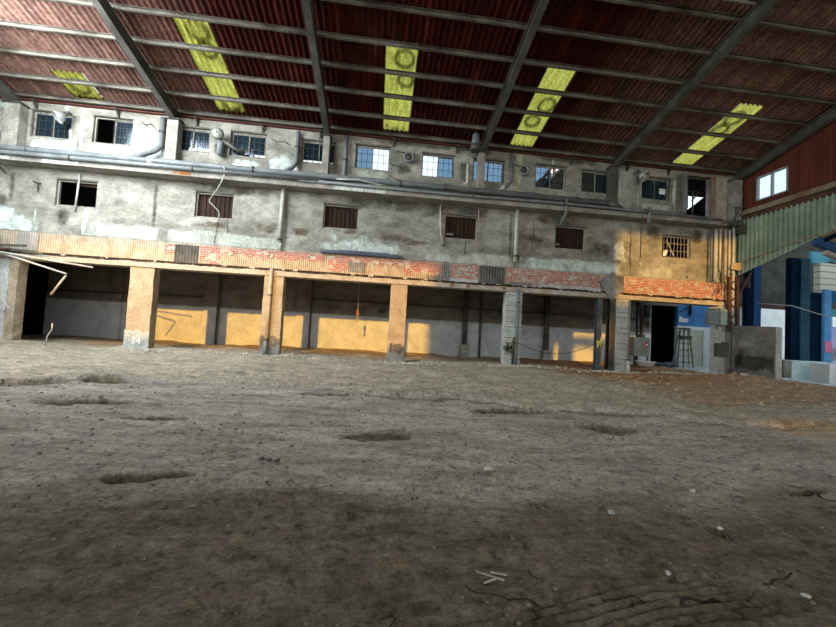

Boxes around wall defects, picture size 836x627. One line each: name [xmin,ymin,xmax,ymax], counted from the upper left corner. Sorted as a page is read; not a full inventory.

flaking render [45,244,600,293]